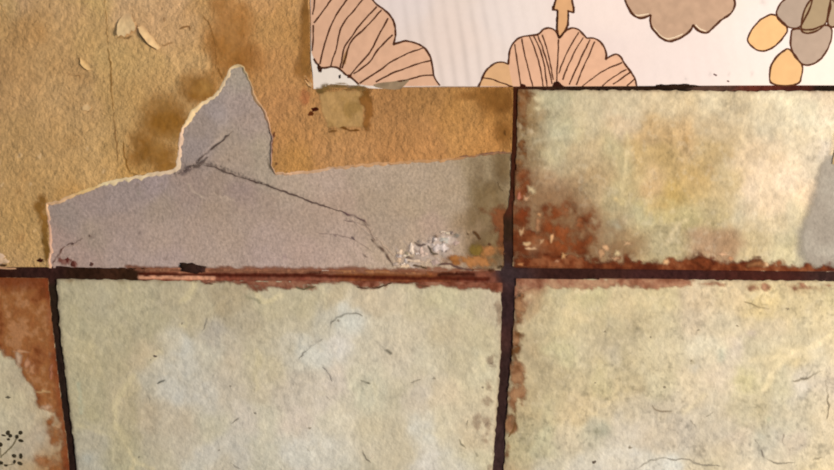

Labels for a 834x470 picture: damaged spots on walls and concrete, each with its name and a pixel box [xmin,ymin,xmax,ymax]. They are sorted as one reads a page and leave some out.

crack [105,12,114,111]
peeling [117,11,165,50]
damp [131,100,185,171]
damp [186,77,215,101]
damp [219,16,249,65]
peeling [46,64,512,271]
crack [182,132,393,265]
rust [518,90,530,127]
rust [201,140,834,433]
rust [0,278,69,470]